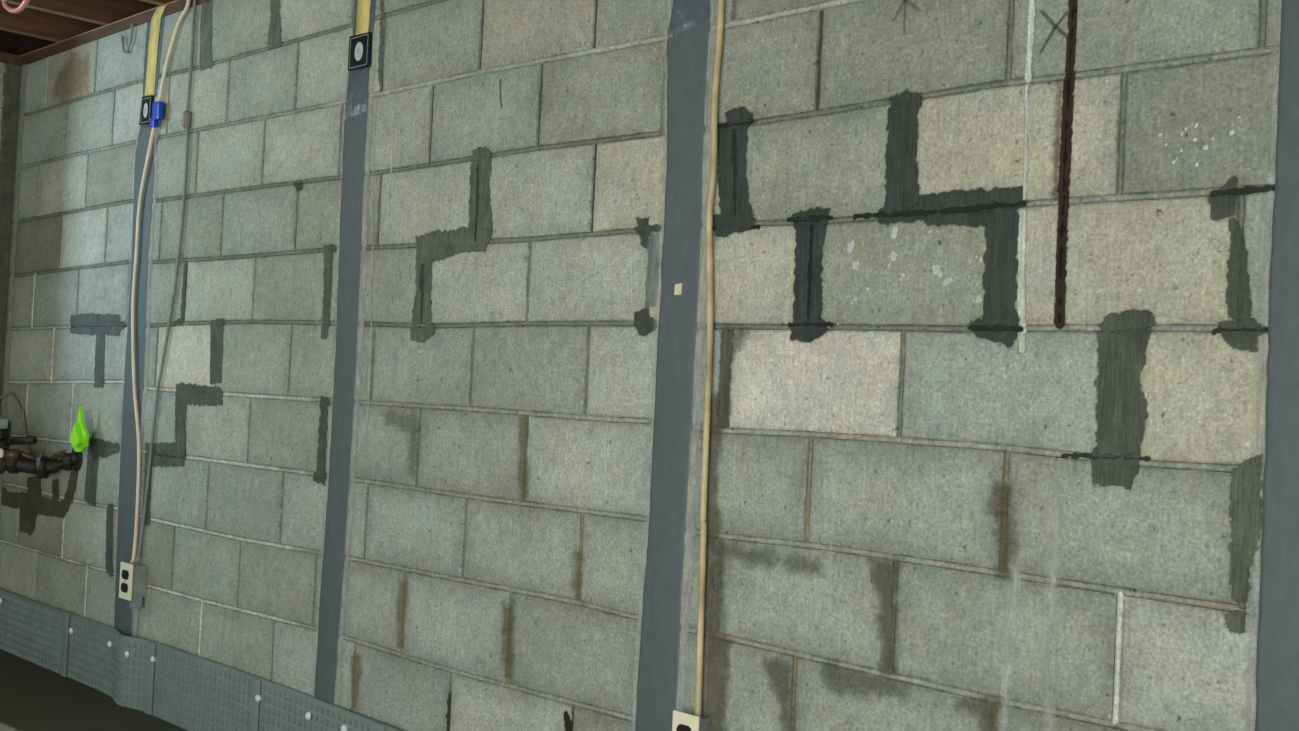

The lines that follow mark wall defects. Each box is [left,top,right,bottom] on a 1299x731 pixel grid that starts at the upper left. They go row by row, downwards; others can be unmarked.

crack [713,0,1078,332]